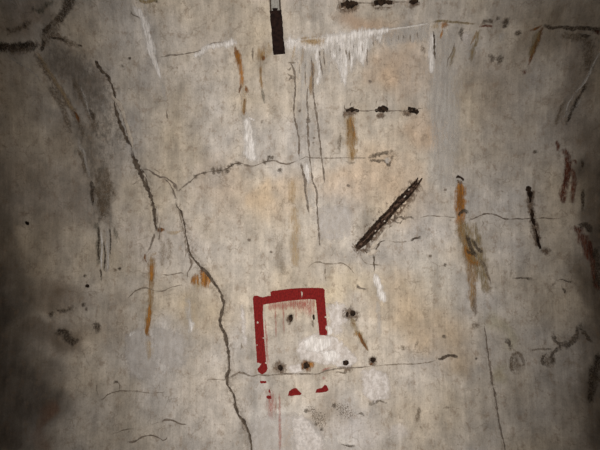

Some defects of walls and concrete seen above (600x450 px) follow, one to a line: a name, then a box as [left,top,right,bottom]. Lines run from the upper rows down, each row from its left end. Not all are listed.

rust [234,47,248,93]
rust [339,119,355,158]
water stain [284,23,471,184]
rust [556,141,584,207]
rust [144,253,164,335]
crack [95,60,457,450]
rust [455,175,490,314]
crack [471,213,555,224]
crack [484,328,505,449]